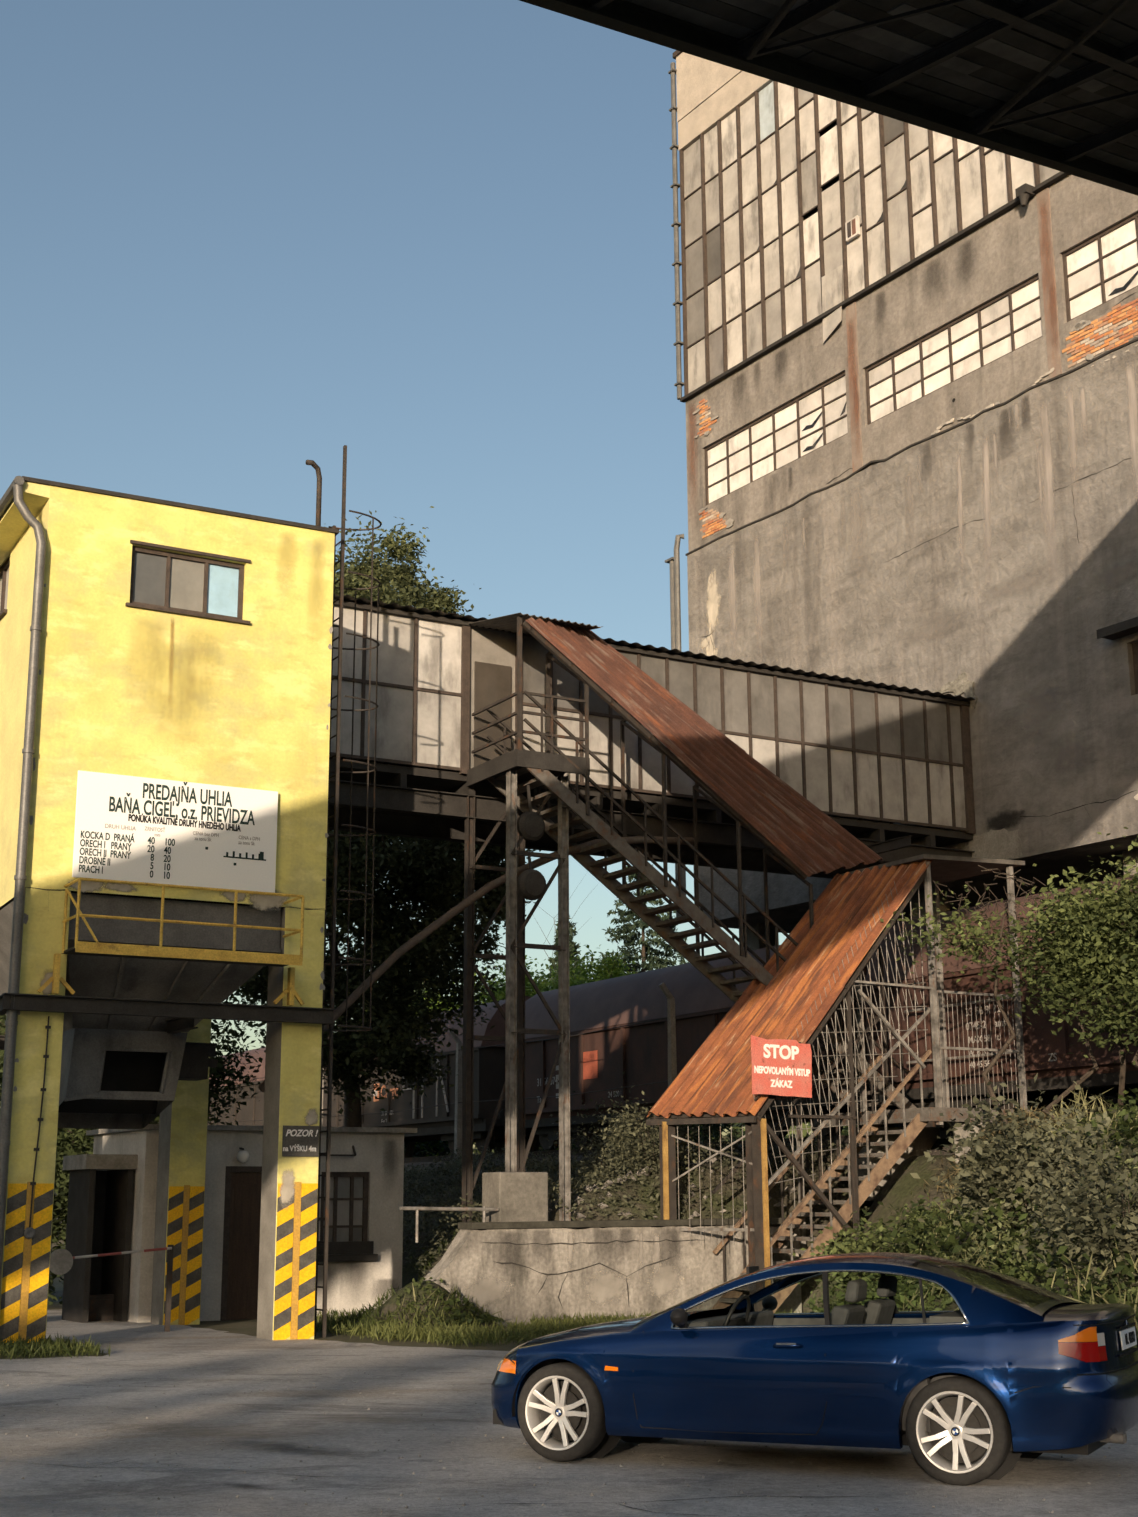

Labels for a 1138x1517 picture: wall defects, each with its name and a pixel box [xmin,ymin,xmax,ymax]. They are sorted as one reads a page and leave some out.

flaking render [1030,298,1138,387]
flaking render [693,395,719,438]
flaking render [698,506,734,541]
leakage [983,434,997,542]
leakage [1009,400,1053,527]
leakage [1067,388,1086,470]
leakage [1127,366,1138,487]
crack [483,1239,698,1308]